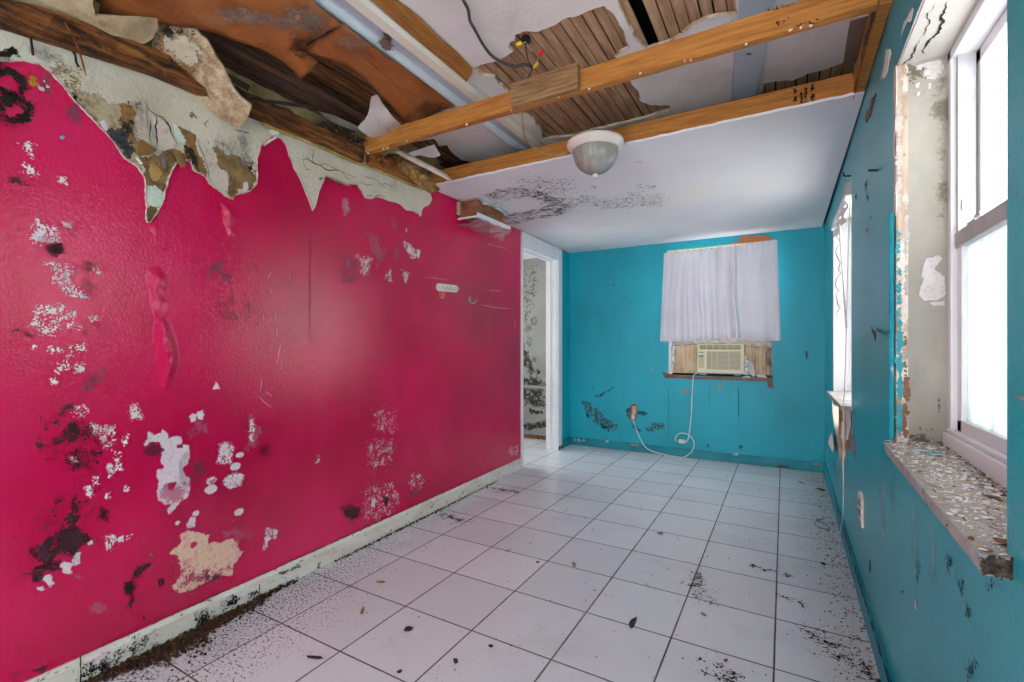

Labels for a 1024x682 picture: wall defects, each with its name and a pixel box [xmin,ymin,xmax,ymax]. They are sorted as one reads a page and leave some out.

flaking render [473,0,737,92]
crack [904,2,947,64]
mould [0,60,36,125]
flaking render [0,29,432,223]
flaking render [515,81,671,140]
crack [300,153,390,197]
peeling [28,261,104,385]
mould [523,260,546,431]
mould [36,403,103,472]
water stain [581,394,665,432]
mould [27,489,110,593]
peeling [142,410,278,597]